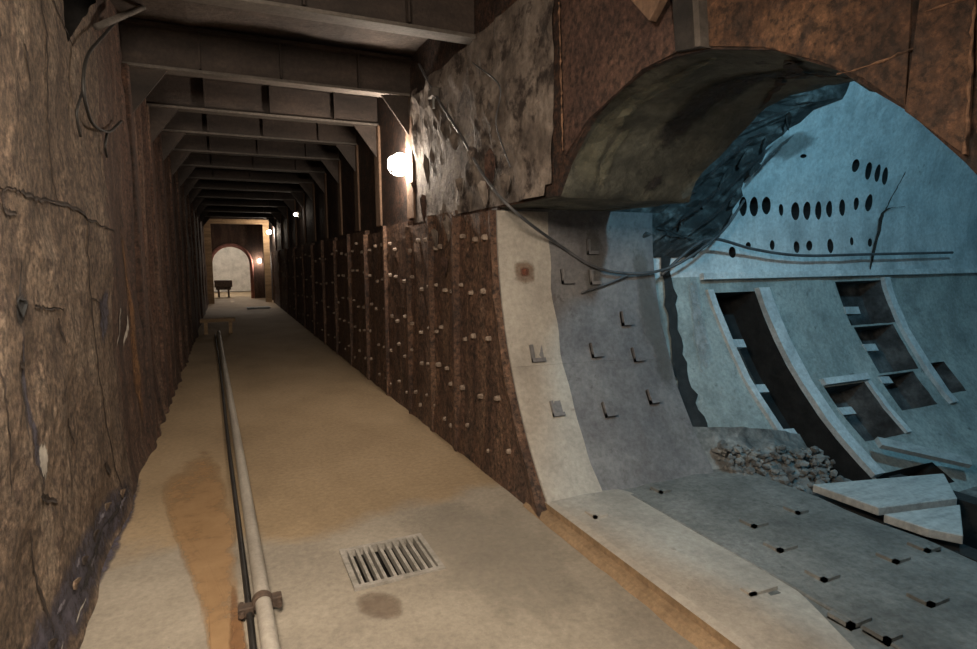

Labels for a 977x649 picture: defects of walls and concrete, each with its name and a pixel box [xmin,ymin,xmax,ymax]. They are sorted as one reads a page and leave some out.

crack [0,0,125,495]
water stain [30,485,139,649]